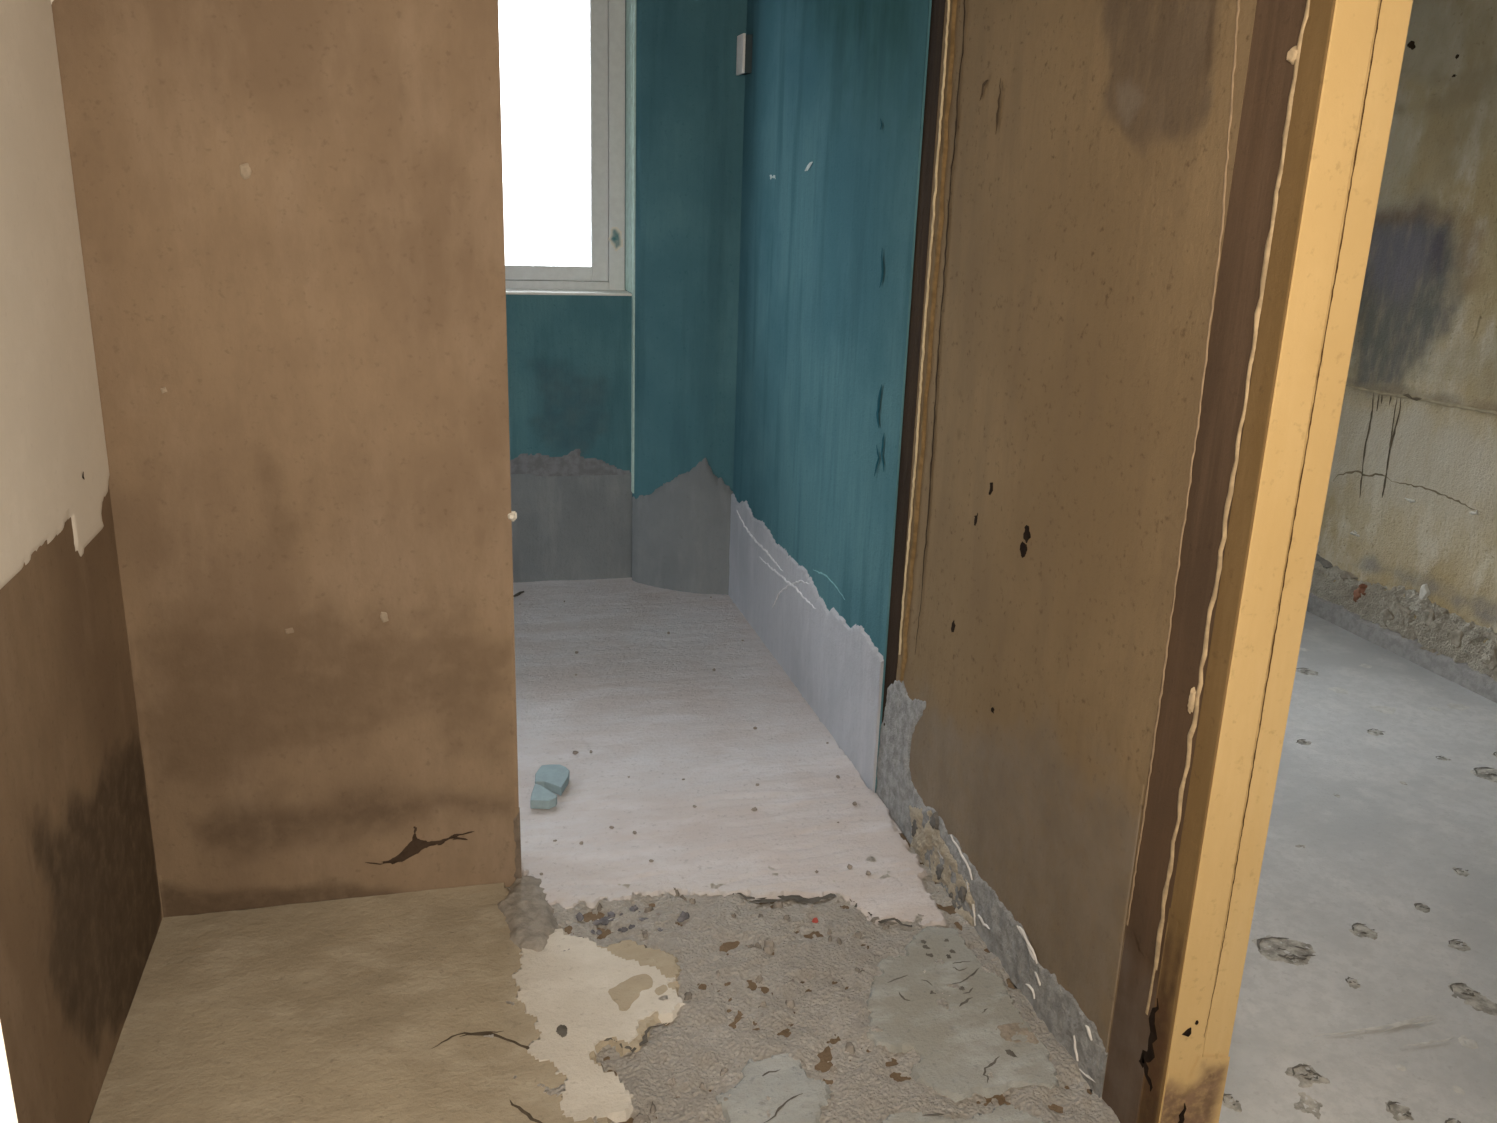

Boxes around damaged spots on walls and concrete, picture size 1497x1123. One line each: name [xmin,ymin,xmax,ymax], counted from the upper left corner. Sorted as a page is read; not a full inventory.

water stain [1093,0,1229,165]
water stain [1348,204,1471,497]
spalling [1309,535,1497,682]
spalling [551,805,1120,1123]